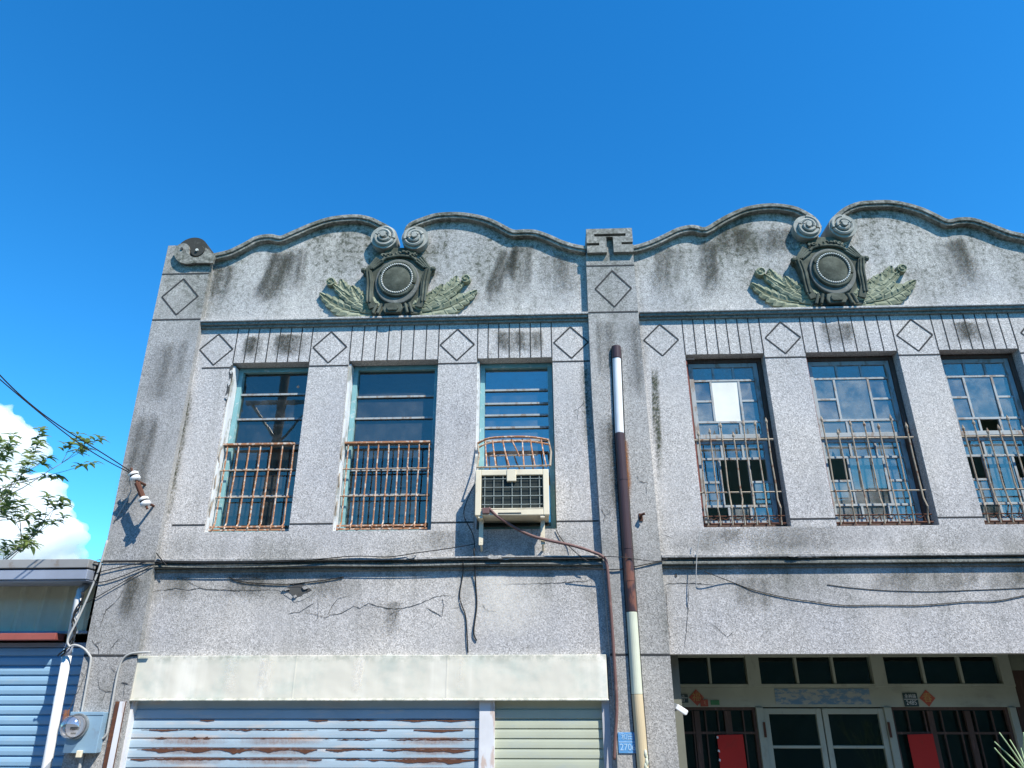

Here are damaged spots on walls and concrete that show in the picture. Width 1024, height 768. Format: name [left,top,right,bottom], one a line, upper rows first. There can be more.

crack [289,578,594,621]
corrosion [130,719,475,764]